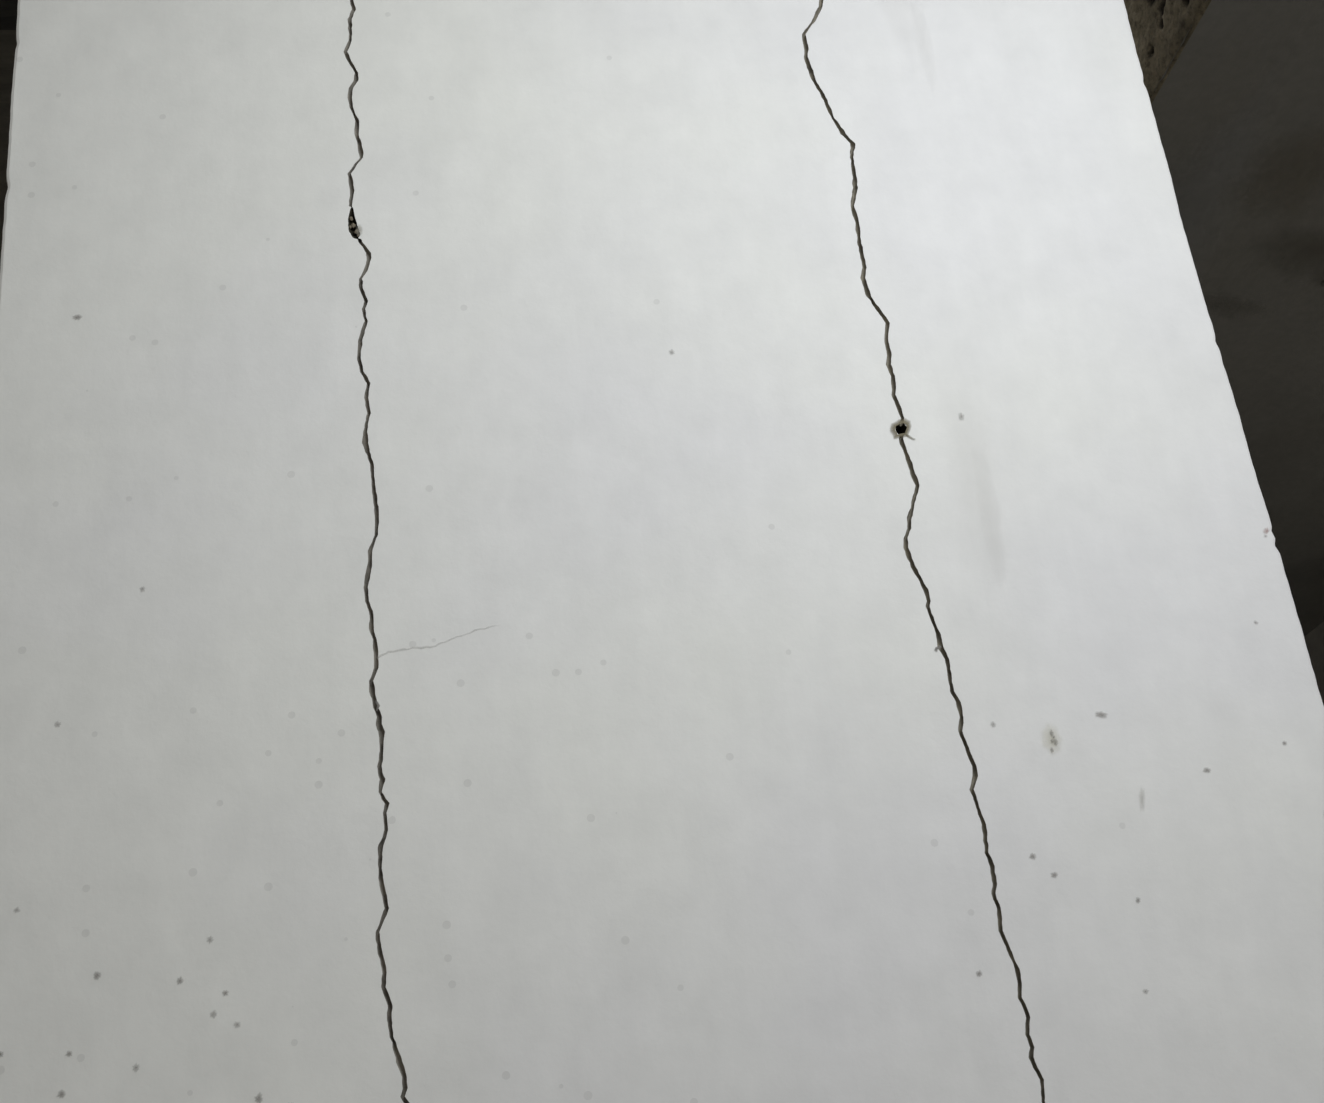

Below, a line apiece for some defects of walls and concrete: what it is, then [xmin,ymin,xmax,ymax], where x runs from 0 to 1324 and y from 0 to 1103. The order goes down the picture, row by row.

crack [344,0,364,207]
crack [357,240,409,1103]
crack [802,0,1045,1103]